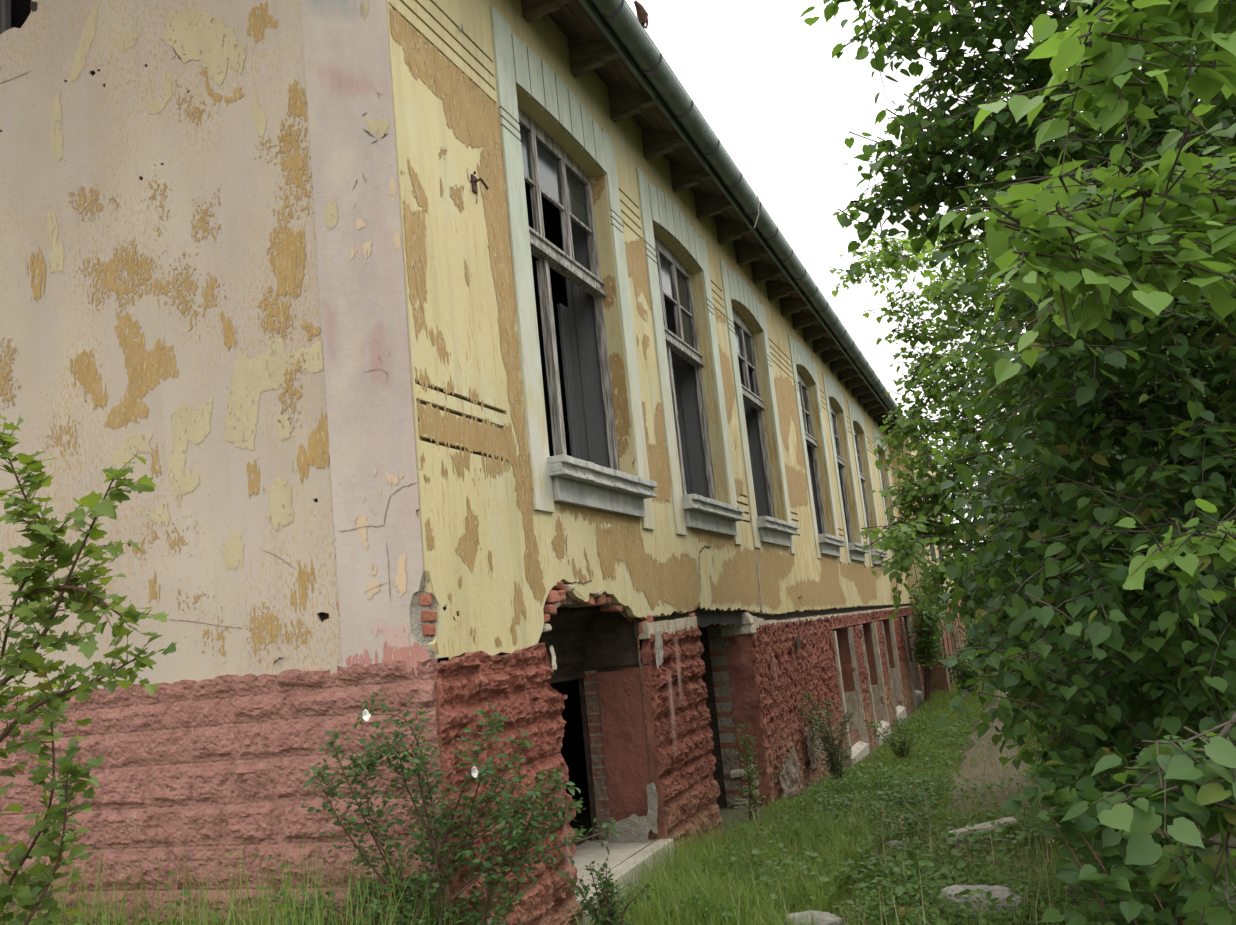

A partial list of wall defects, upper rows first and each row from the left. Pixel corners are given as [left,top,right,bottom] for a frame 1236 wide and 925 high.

peeling [161,1,278,133]
peeling [0,328,22,410]
peeling [27,249,54,302]
peeling [68,77,341,560]
peeling [355,7,910,670]
peeling [40,411,80,470]
crack [341,482,418,595]